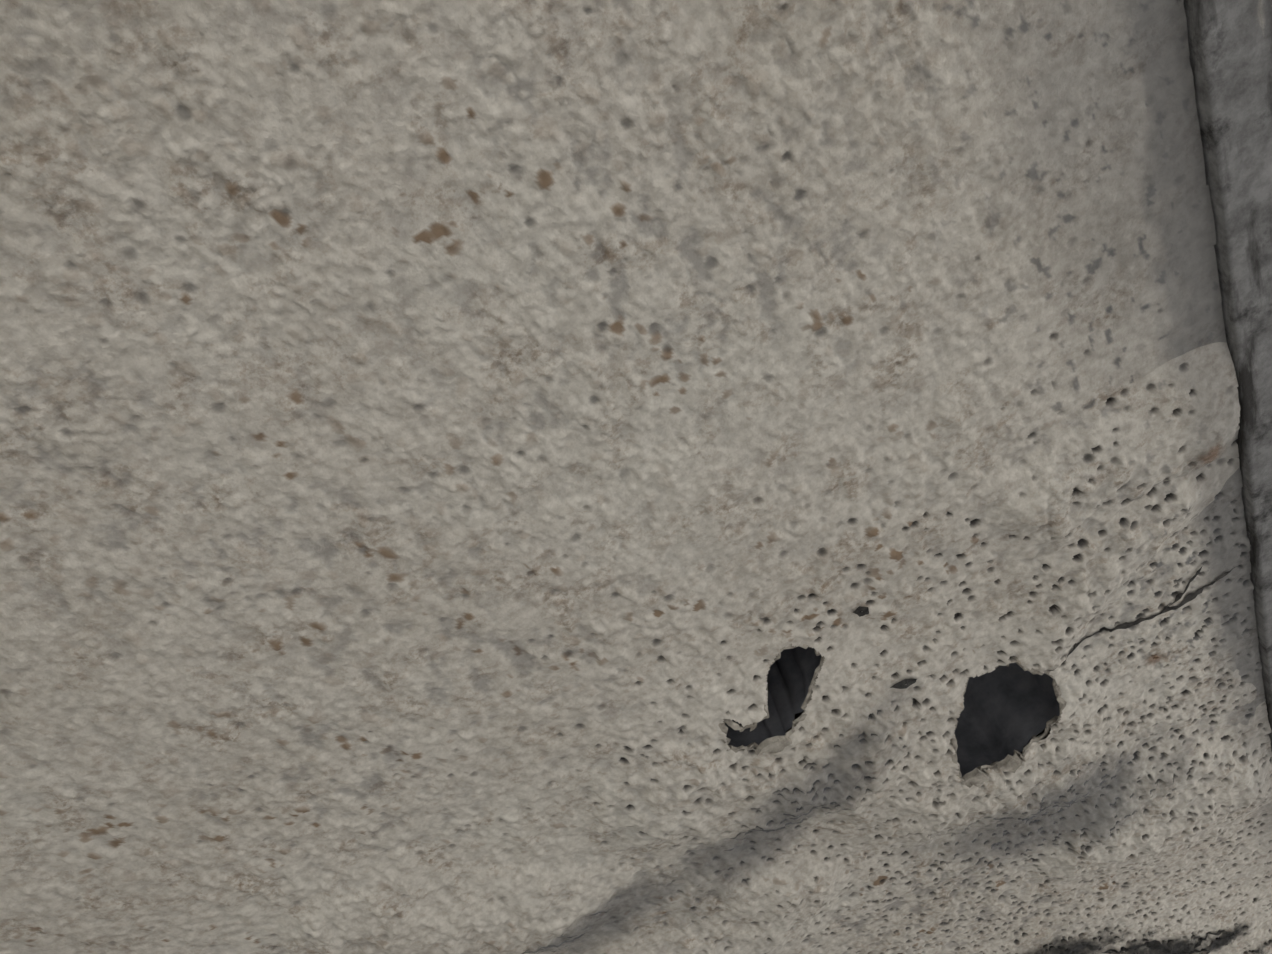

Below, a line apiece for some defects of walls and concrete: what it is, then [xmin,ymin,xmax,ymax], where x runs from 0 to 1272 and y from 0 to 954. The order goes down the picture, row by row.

spalling [725,646,821,756]
spalling [954,662,1060,788]
water stain [1034,924,1249,954]